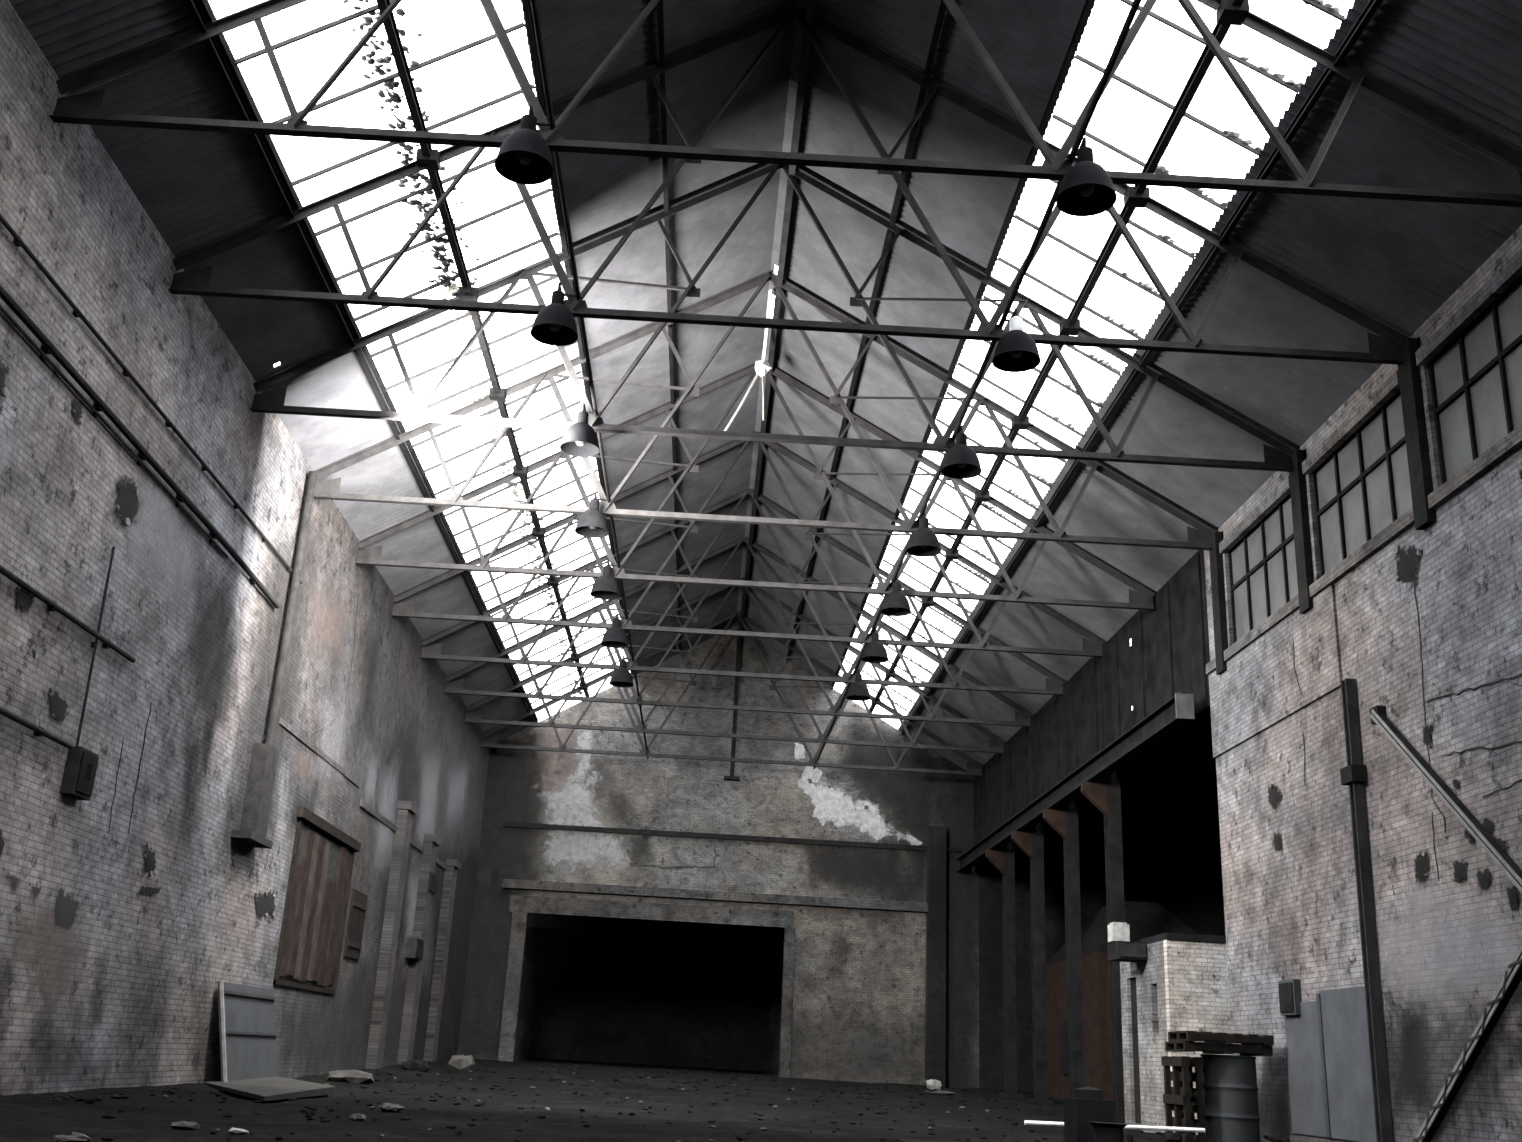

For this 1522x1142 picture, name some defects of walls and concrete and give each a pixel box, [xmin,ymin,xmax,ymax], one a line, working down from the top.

peeling [794,743,923,845]
crack [1413,578,1522,881]